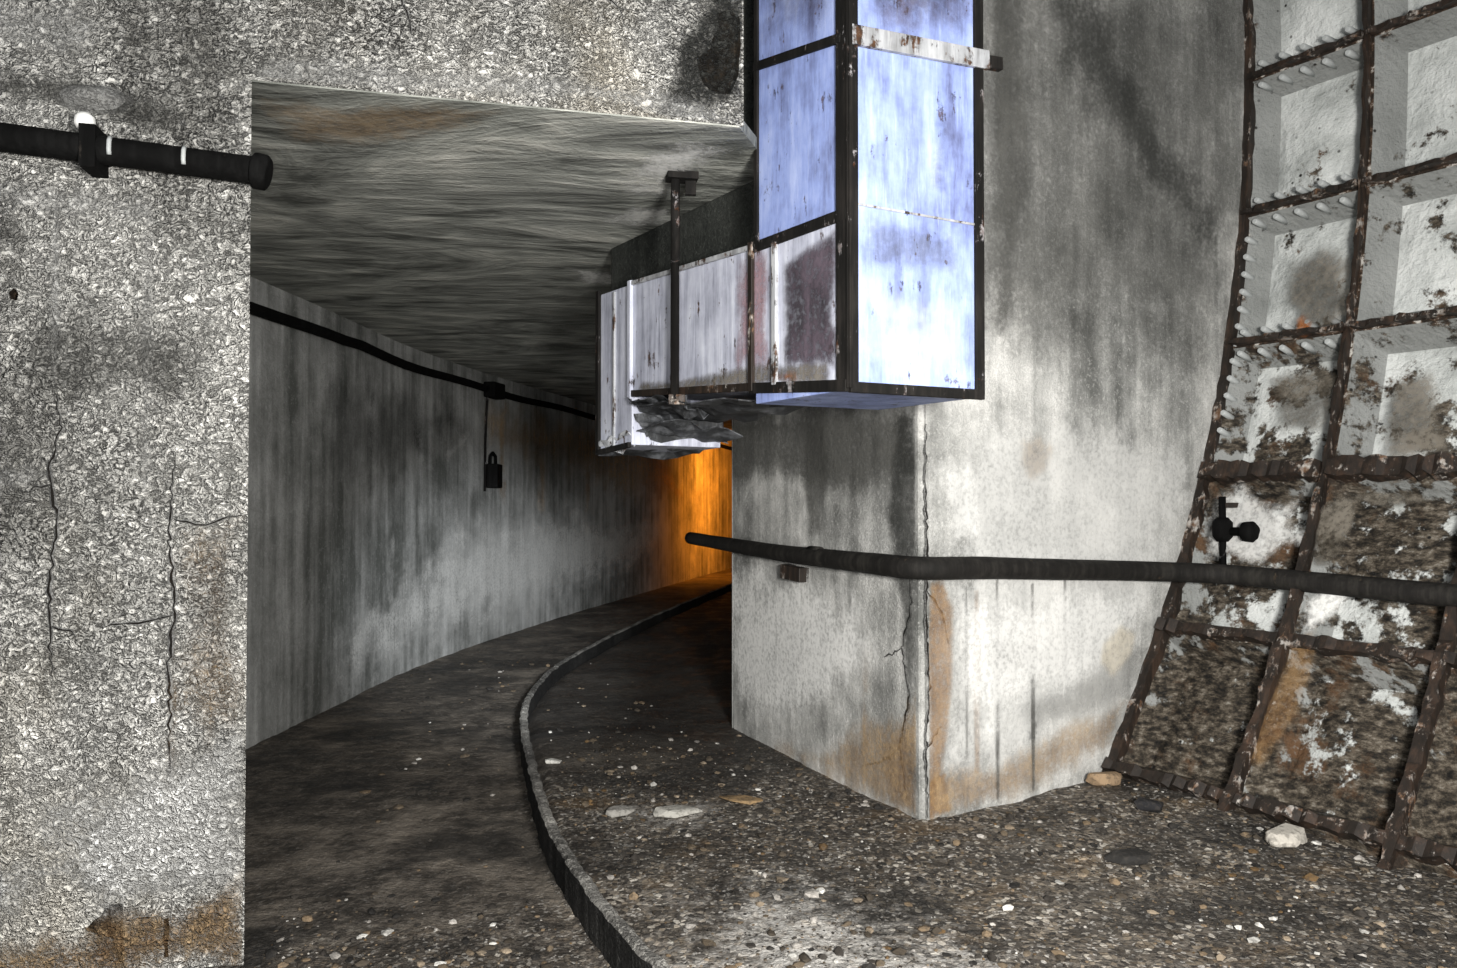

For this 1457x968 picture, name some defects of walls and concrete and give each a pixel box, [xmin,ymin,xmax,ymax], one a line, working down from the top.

damp [665,0,742,110]
peeling [1292,252,1346,324]
peeling [1276,371,1330,428]
peeling [1389,375,1445,456]
peeling [1214,494,1289,558]
corrosion [1314,493,1423,564]
crack [17,393,241,861]
crack [862,424,949,817]
peeling [1309,594,1343,626]
corrosion [930,587,950,814]
corrosion [0,896,236,968]